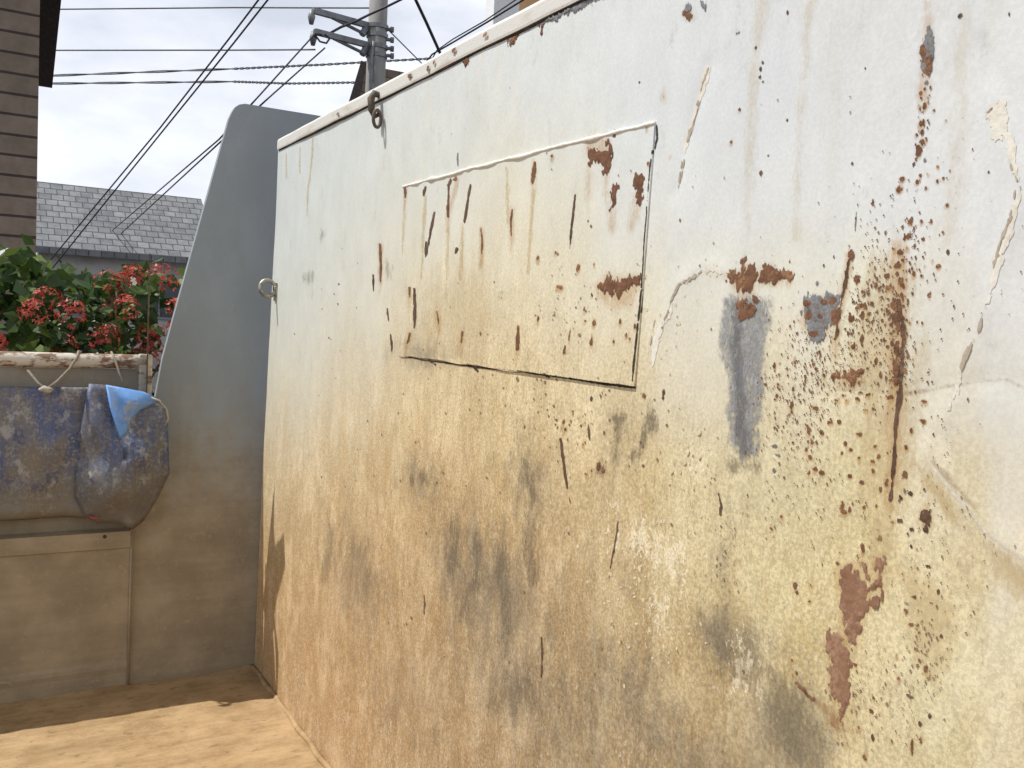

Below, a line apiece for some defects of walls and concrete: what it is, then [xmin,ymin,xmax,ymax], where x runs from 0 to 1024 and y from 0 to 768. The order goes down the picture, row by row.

corrosion [587,129,658,212]
corrosion [535,251,649,354]
peeling [947,98,1022,411]
water stain [733,318,746,455]
corrosion [725,25,975,760]